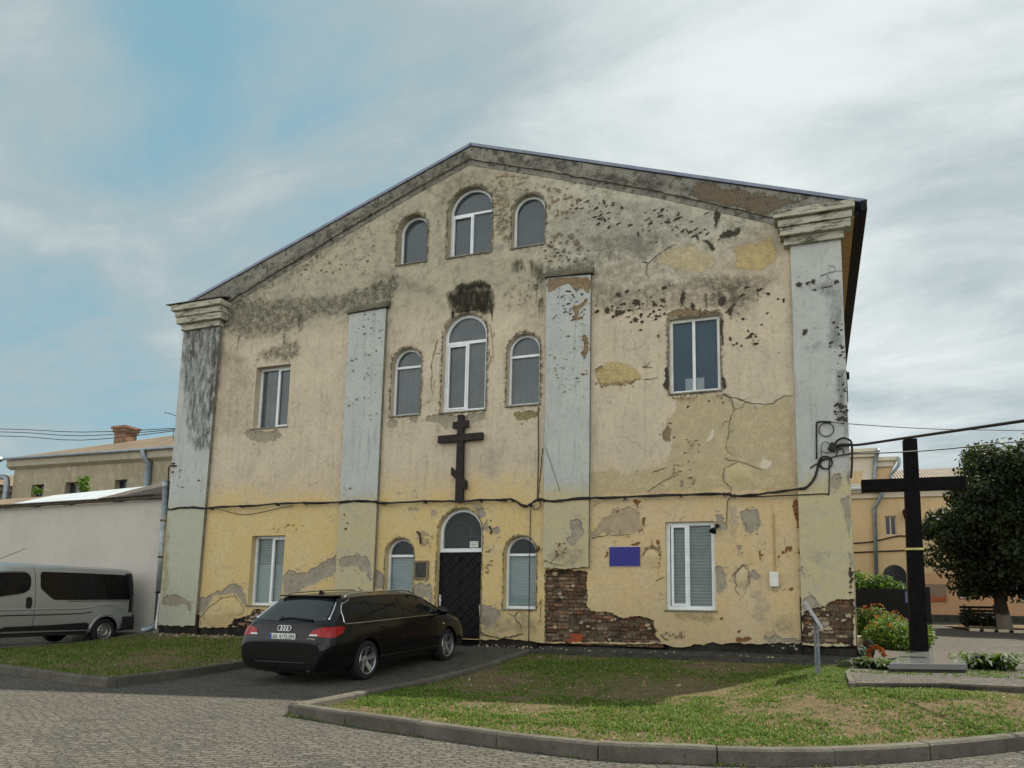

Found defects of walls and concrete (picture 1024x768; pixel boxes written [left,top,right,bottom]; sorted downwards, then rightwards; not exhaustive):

flaking render [493,173,793,404]
water stain [181,278,395,449]
water stain [439,280,494,415]
peeling [829,321,849,421]
crack [721,393,793,487]
peeling [543,366,798,648]
flaking render [161,580,265,628]
flaking render [283,551,386,594]
flaking render [479,600,501,629]
flaking render [762,552,857,650]